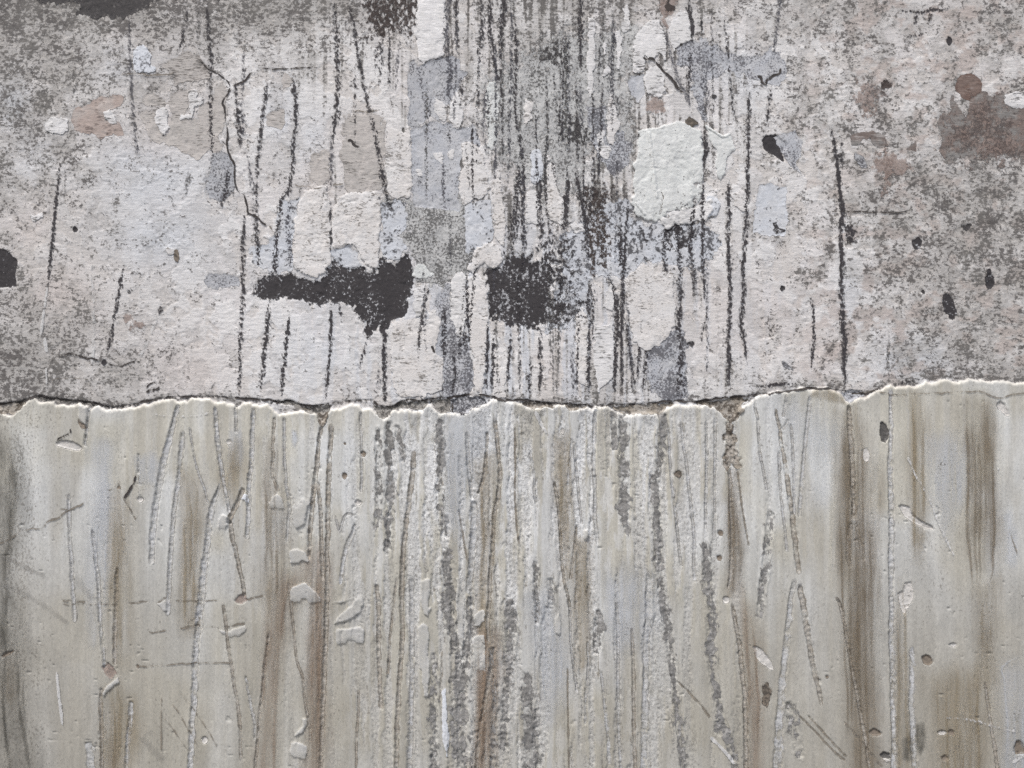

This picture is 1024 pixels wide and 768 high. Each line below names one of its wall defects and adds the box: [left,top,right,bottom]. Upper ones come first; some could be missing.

spalling [37,0,163,23]
peeling [45,94,124,139]
crack [201,62,313,229]
crack [0,353,1024,412]
spalling [203,0,829,768]